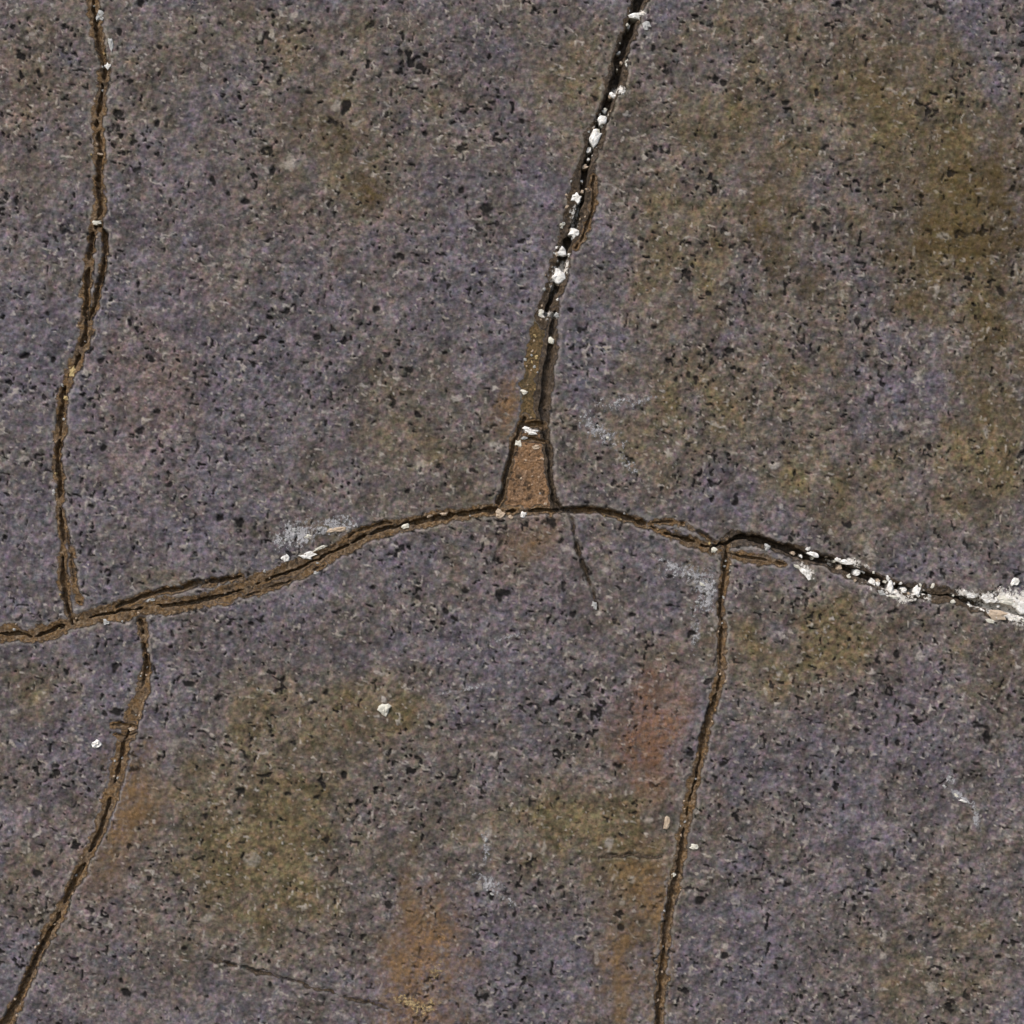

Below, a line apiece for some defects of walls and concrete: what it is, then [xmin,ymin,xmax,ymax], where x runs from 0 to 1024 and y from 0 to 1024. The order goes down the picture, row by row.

crack [0,0,651,644]
crack [0,617,152,1024]
crack [209,957,388,1009]
crack [564,505,1024,1024]